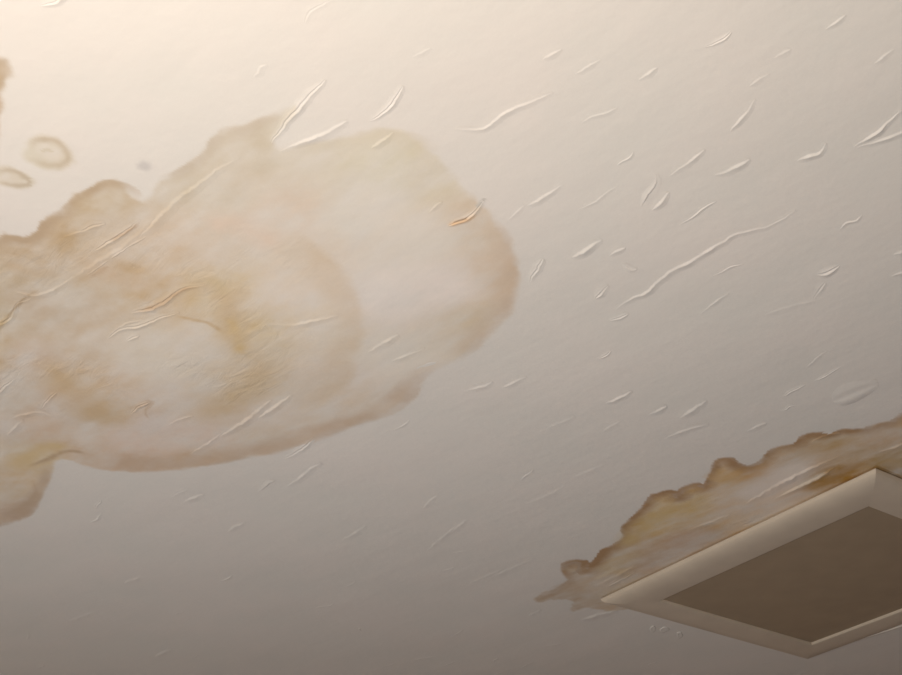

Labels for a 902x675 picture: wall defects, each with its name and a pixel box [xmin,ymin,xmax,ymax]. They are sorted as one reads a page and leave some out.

damp [0,54,19,151]
damp [0,102,525,529]
damp [529,412,902,613]